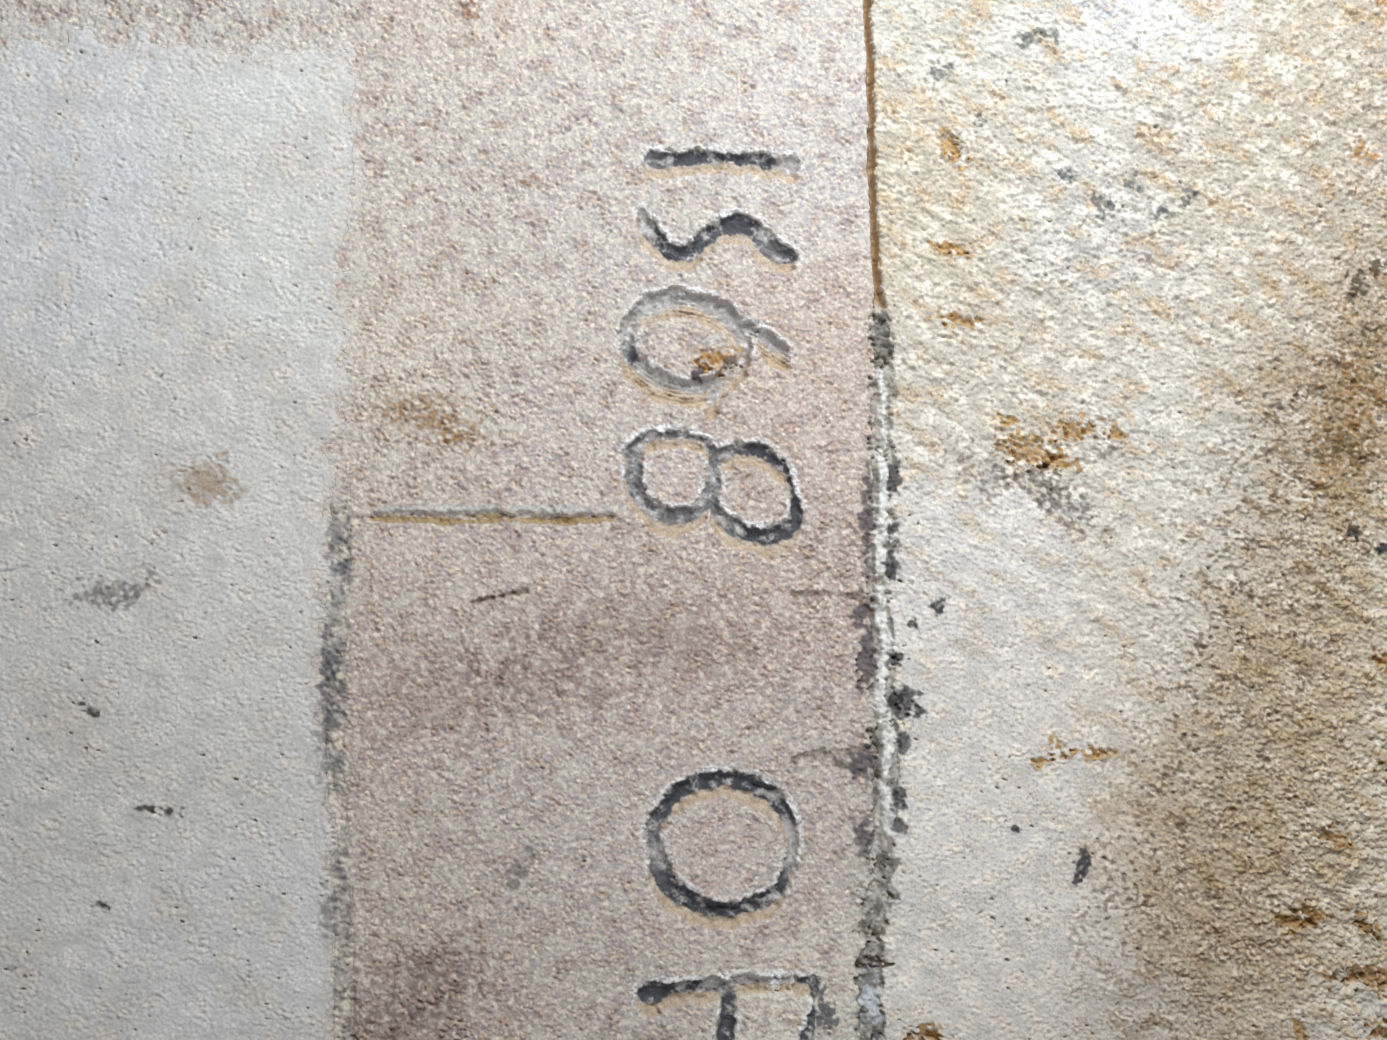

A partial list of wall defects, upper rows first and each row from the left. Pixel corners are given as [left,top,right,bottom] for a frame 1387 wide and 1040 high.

damp [941,438,1088,533]